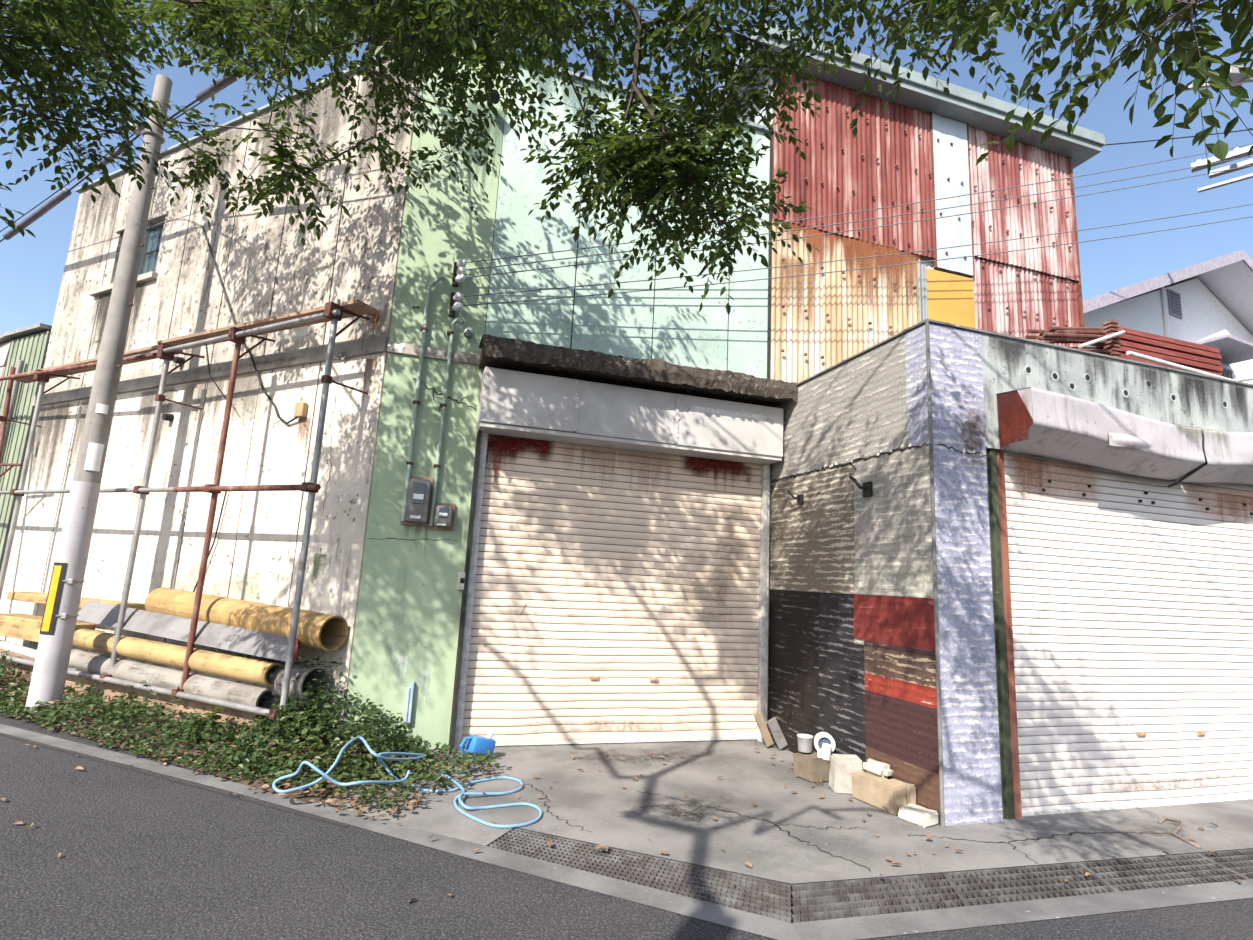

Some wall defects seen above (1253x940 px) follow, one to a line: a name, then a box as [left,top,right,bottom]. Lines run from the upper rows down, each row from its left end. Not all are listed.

rust [780,222,914,313]
damp [30,402,89,487]
damp [140,389,173,444]
rust [486,434,552,481]
rust [685,456,750,481]
damp [1181,376,1247,416]
crack [507,775,591,832]
crack [636,790,871,871]